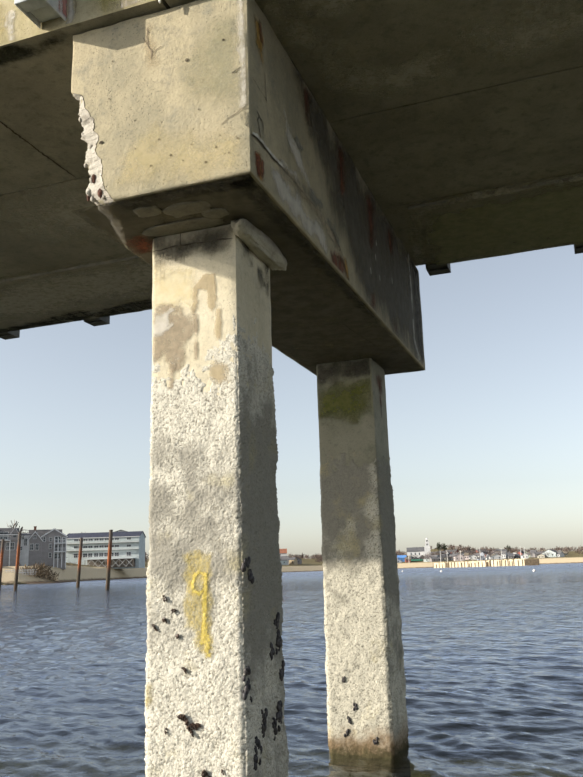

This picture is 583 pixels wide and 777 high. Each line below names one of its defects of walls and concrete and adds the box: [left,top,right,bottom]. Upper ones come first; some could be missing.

damp [0,11,59,65]
spalling [73,93,113,205]
corrosion [255,151,264,180]
crack [221,80,314,206]
damp [0,70,523,389]
peeling [154,270,221,359]
peeling [211,364,225,382]